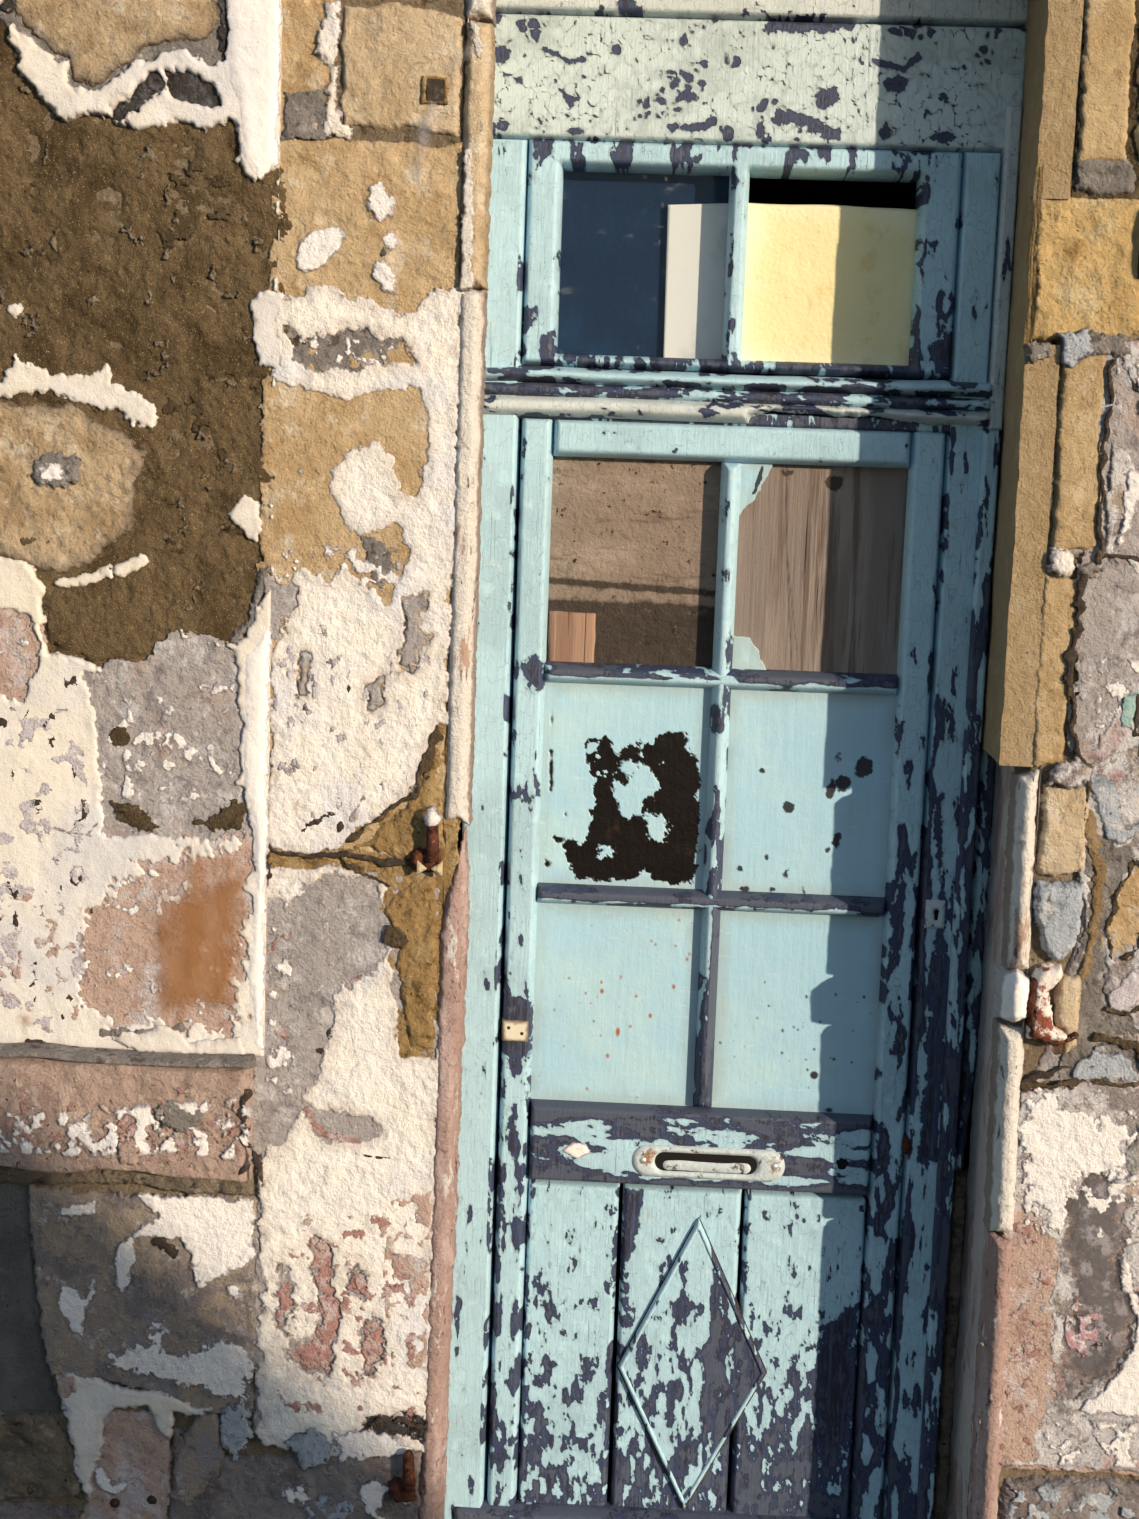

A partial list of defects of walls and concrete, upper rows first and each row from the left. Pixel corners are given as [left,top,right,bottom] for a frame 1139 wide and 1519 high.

flaking render [0,0,461,1165]
peeling [1066,357,1139,752]
peeling [980,772,1139,1519]
crack [1020,1005,1139,1091]
peeling [275,1191,434,1519]